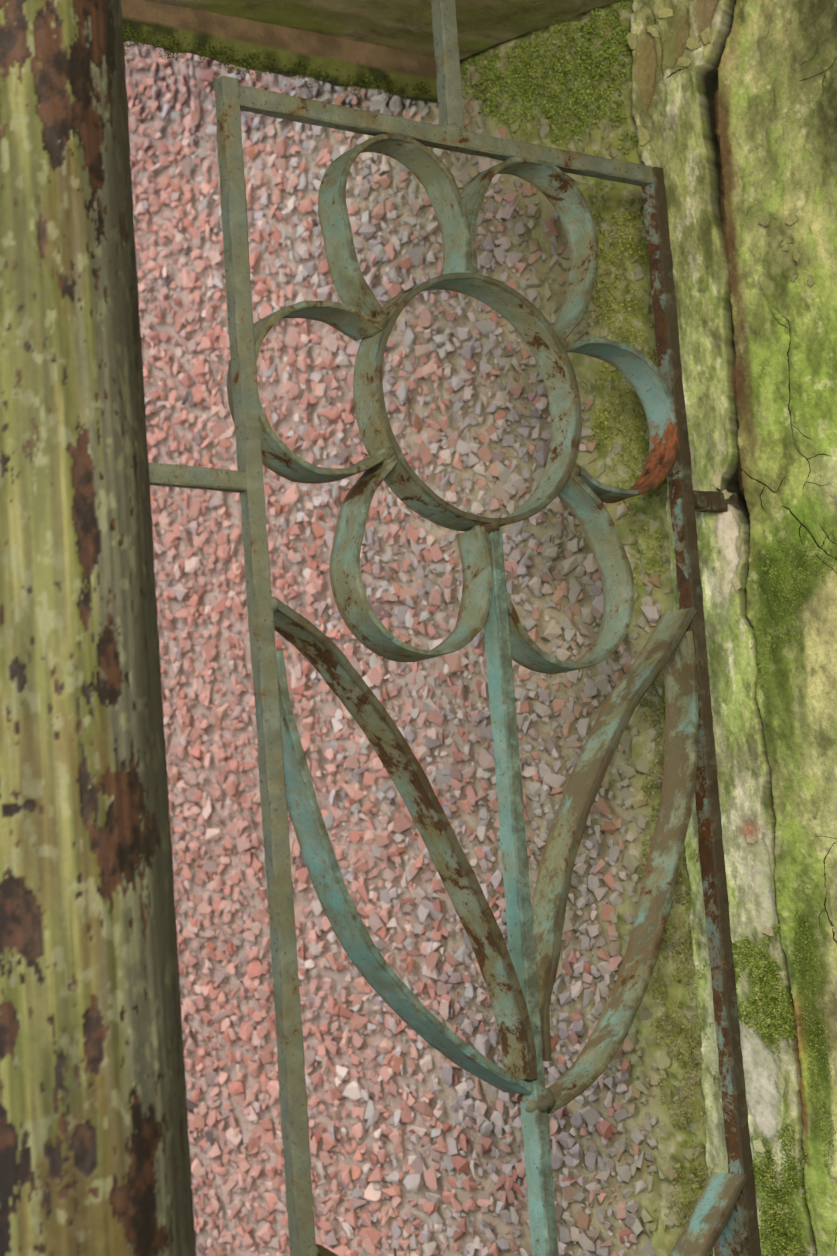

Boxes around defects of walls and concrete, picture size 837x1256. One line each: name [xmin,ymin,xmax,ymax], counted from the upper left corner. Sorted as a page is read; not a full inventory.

spalling [124,41,439,471]
spalling [240,111,674,952]
spalling [462,62,524,142]
crack [742,313,837,574]
spalling [150,485,290,1256]
spalling [275,631,504,1069]
spalling [288,813,530,1256]
spalling [543,687,665,1088]
spalling [549,1008,706,1256]
crack [816,836,837,944]